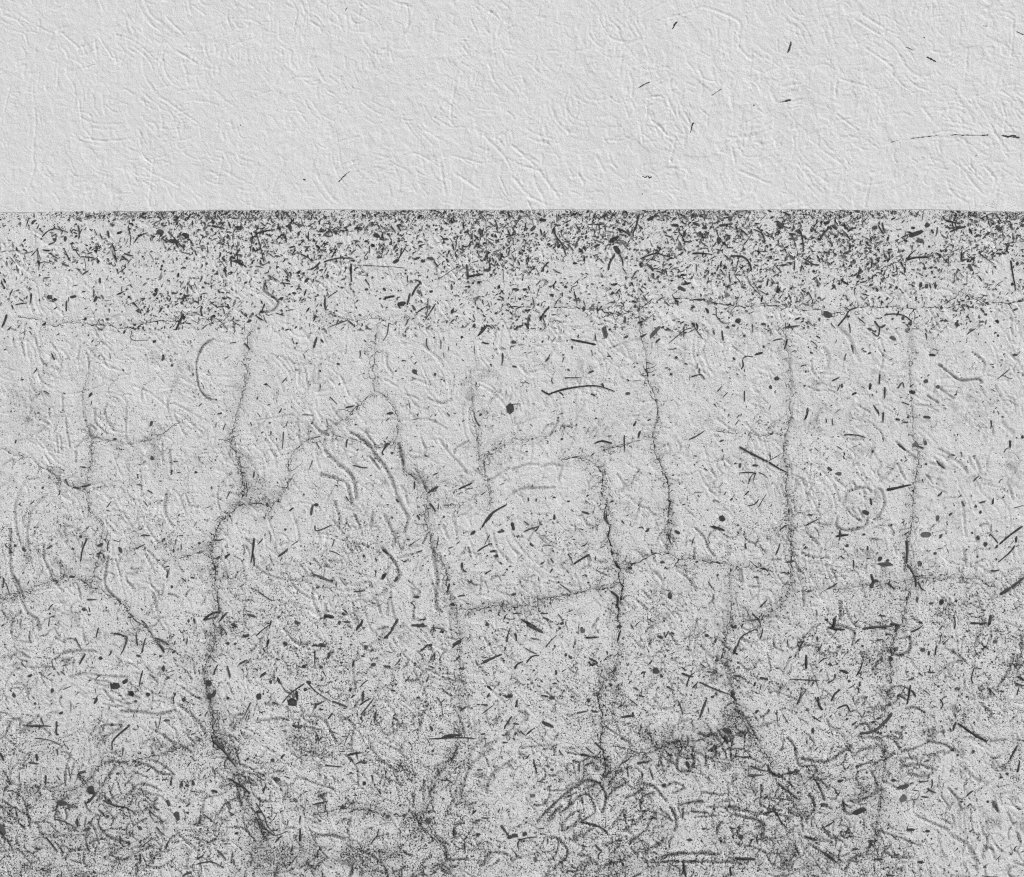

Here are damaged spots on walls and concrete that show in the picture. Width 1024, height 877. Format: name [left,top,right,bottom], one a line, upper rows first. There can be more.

crack [0,281,1023,864]